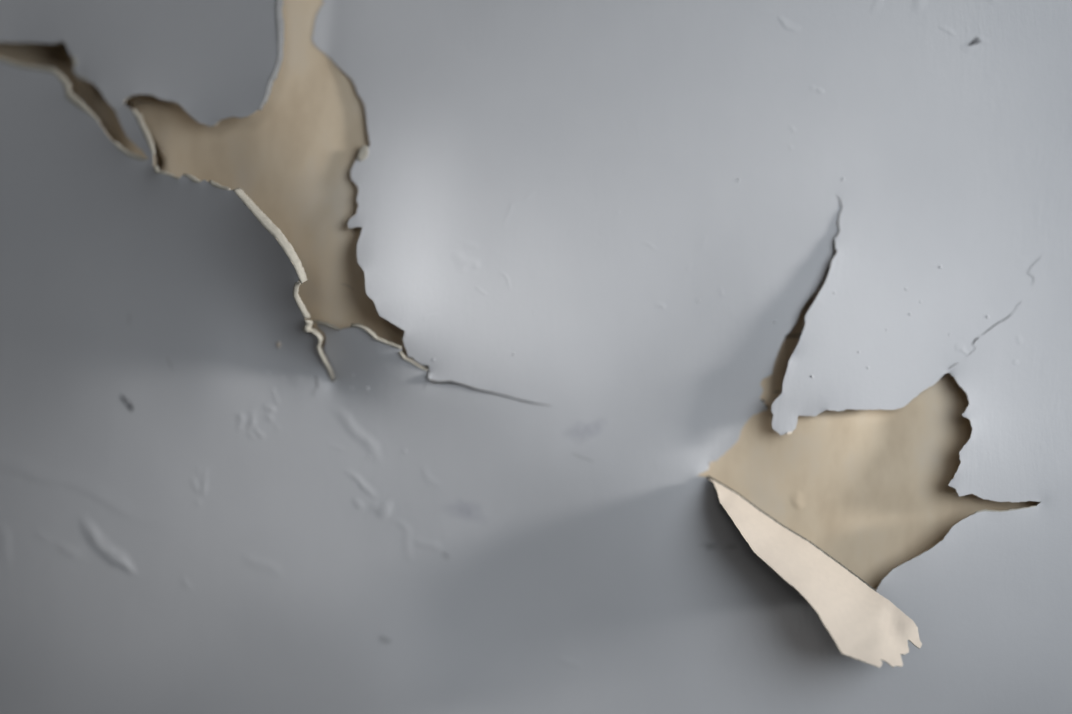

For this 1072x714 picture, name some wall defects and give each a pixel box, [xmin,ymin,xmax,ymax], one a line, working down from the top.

peeling [0,0,550,406]
peeling [697,197,1040,668]